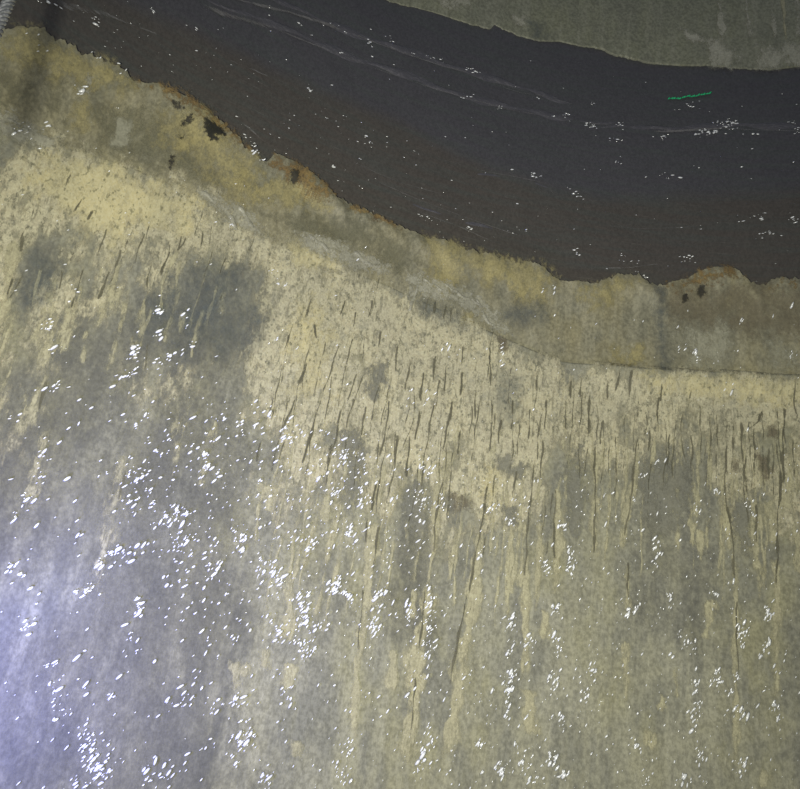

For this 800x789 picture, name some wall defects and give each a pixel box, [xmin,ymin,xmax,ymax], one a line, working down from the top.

spalling [172,100,193,126]
spalling [203,117,226,141]
peeling [294,230,391,273]
water stain [426,237,556,318]
water stain [131,299,152,370]
water stain [178,287,224,357]
water stain [0,377,47,451]
water stain [130,365,199,404]
water stain [24,437,46,506]
water stain [95,525,116,577]
water stain [547,477,566,592]
water stain [384,586,439,760]